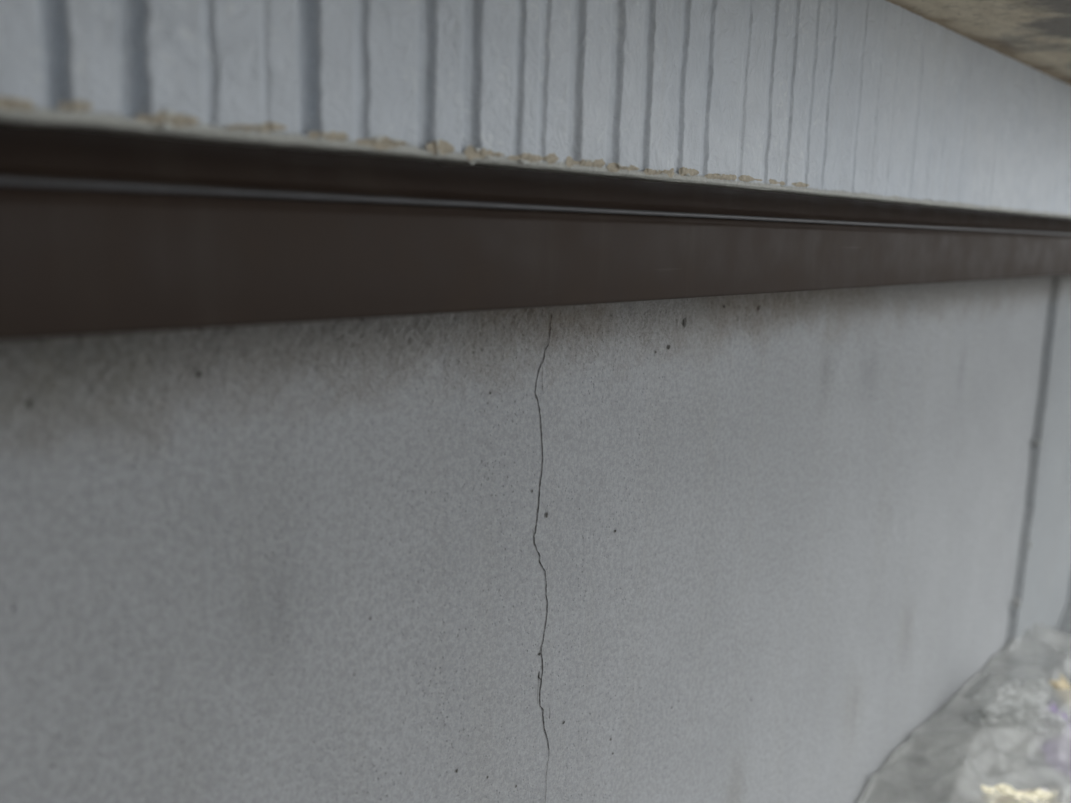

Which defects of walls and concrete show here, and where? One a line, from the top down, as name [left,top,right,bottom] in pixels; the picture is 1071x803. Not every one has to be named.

crack [532,314,552,802]